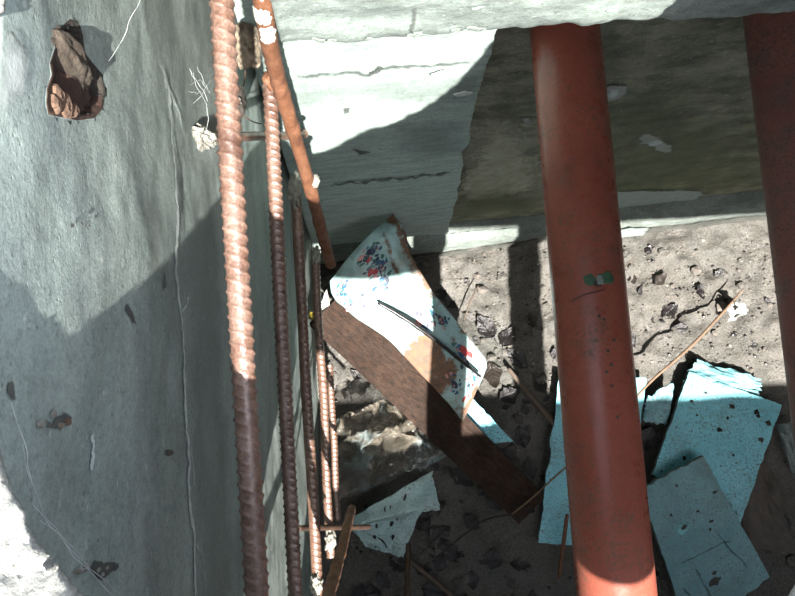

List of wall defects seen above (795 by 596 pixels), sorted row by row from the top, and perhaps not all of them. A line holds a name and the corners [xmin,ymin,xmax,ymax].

spalling [44,16,106,124]
crack [298,62,469,78]
water stain [457,120,542,202]
crack [337,172,449,185]
water stain [645,216,767,233]
water stain [412,239,547,259]
crack [162,67,206,596]
spalling [37,410,72,429]
spalling [74,561,119,580]